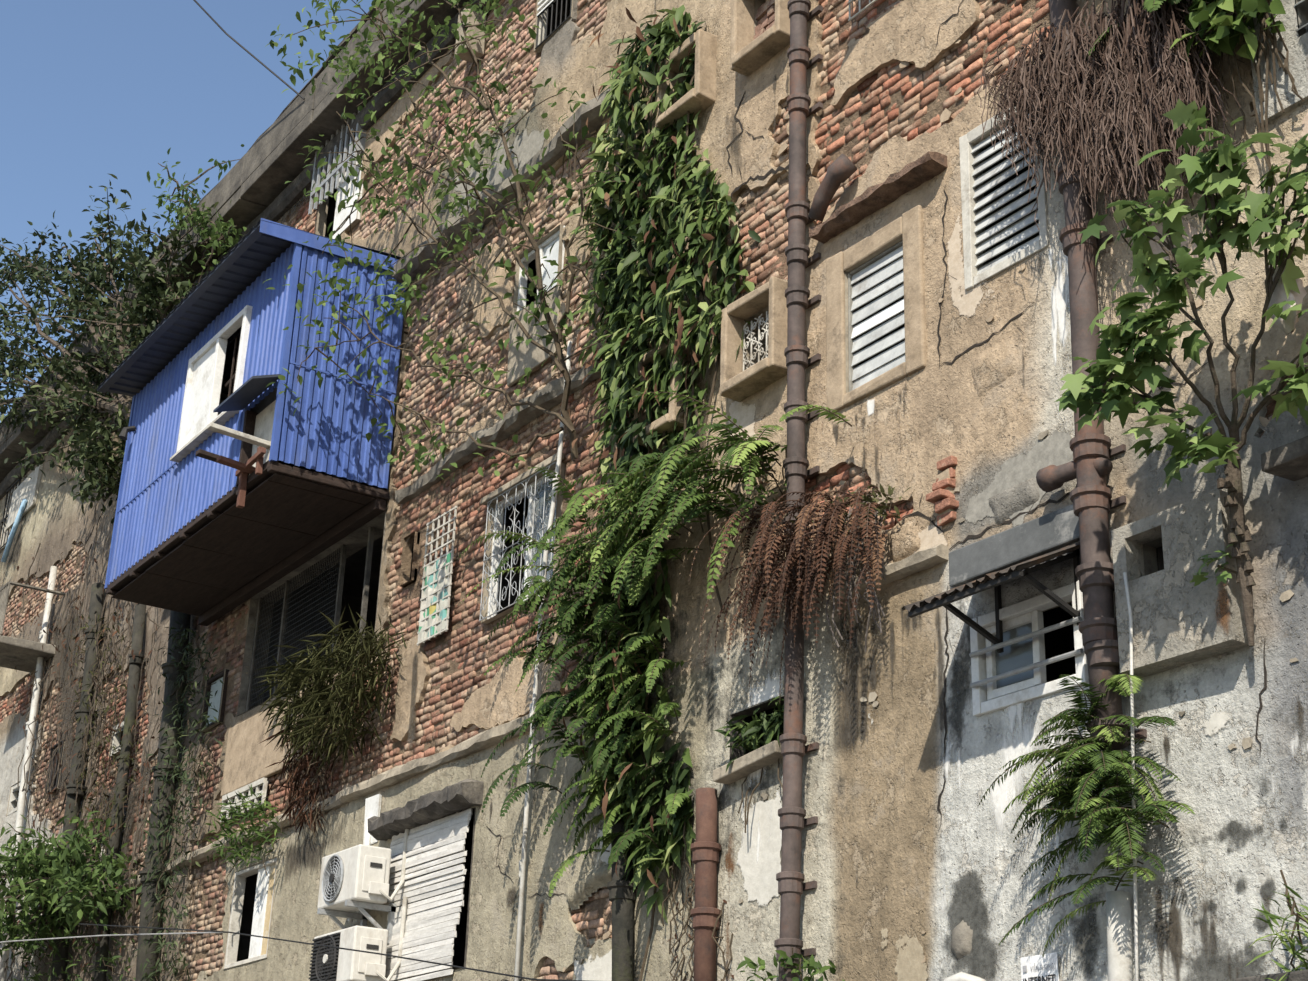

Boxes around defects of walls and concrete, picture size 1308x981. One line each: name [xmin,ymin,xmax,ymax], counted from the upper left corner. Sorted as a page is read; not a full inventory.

spalling [350,0,545,241]
crack [726,92,789,216]
spalling [731,100,789,300]
spalling [806,0,1051,224]
crack [937,183,1035,367]
spalling [181,125,612,981]
peeling [953,429,1073,527]
damp [838,605,917,748]
crack [937,586,954,828]
damp [940,871,998,981]
damp [1155,877,1276,981]
damp [1216,821,1263,853]